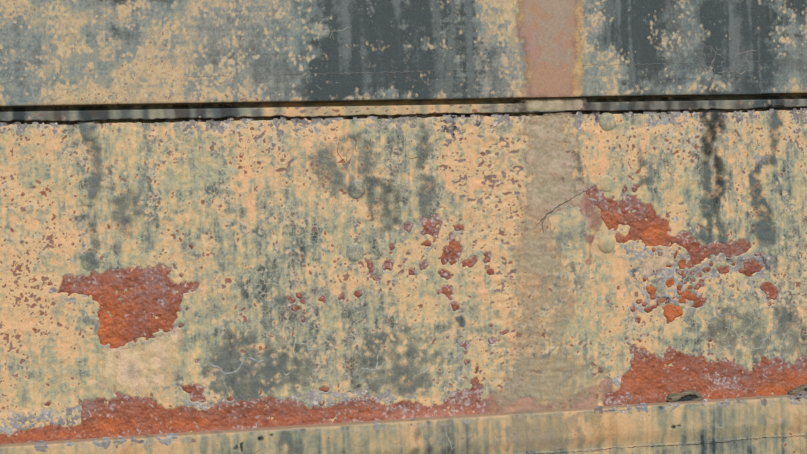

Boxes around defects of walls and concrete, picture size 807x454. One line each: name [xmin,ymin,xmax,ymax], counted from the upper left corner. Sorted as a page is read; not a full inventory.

rust [366,243,395,282]
rust [403,214,494,311]
crack [536,185,597,232]
rust [576,184,779,324]
damp [700,110,726,244]
rust [0,264,807,446]